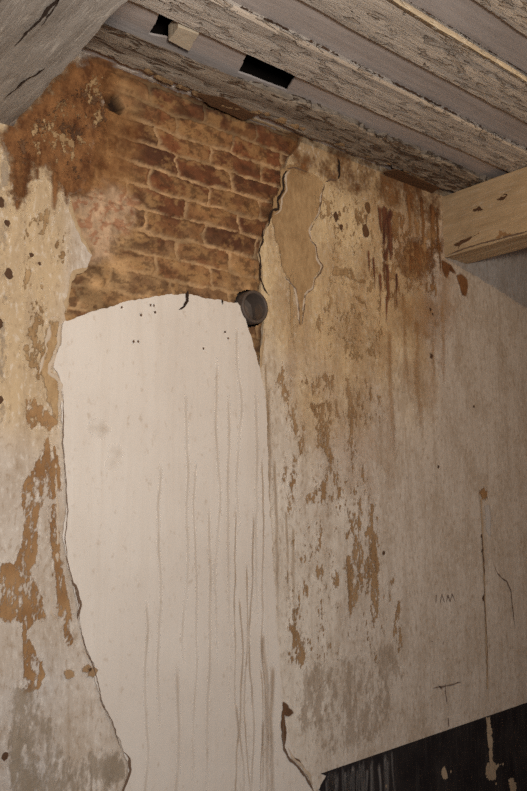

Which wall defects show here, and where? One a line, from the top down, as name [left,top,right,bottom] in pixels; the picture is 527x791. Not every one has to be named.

peeling [241,6,338,56]
flaking render [17,61,468,431]
crack [259,167,307,295]
leakage [289,132,365,192]
crack [326,159,341,182]
leakage [376,169,443,284]
peeling [276,363,402,668]
peeling [0,438,125,791]
flaking render [485,716,504,785]